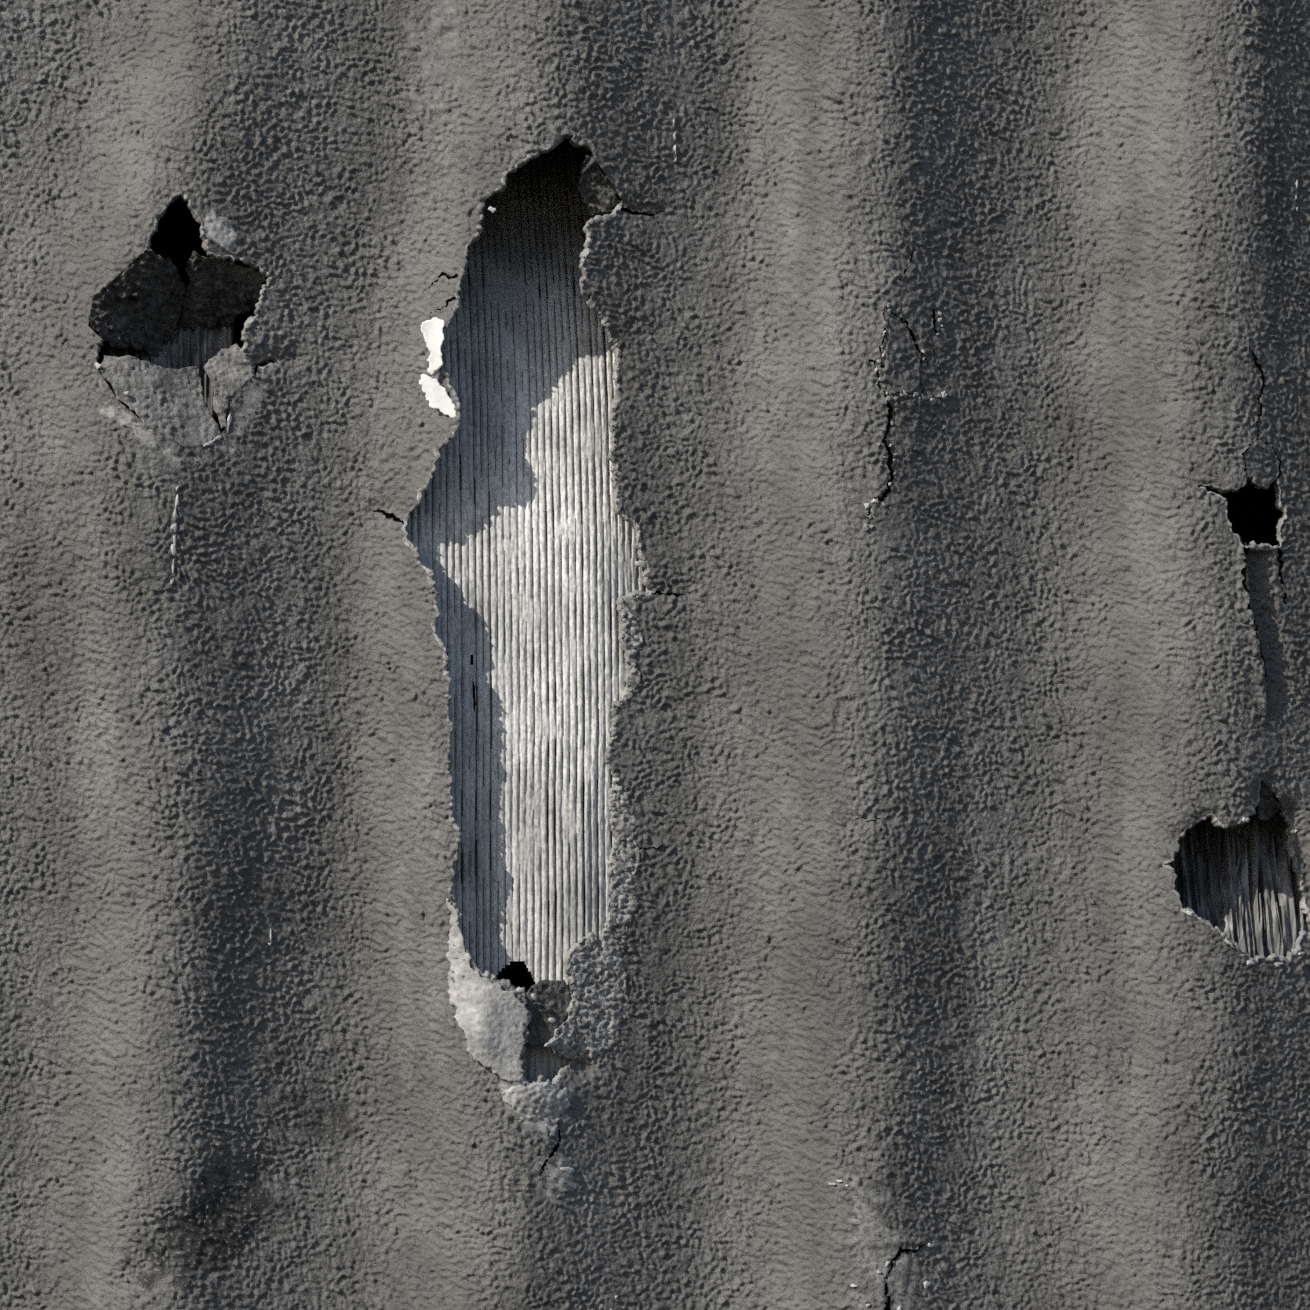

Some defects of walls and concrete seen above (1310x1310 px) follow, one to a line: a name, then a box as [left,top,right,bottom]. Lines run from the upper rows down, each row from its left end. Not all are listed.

spalling [144,198,272,376]
spalling [92,329,106,381]
spalling [201,414,232,447]
peeling [419,317,456,418]
crack [863,248,947,531]
crack [1242,344,1282,479]
spalling [1205,479,1283,560]
spalling [615,596,643,707]
crack [1241,542,1289,701]
spalling [544,784,640,1060]
spalling [446,899,570,1136]
crack [850,1243,934,1310]